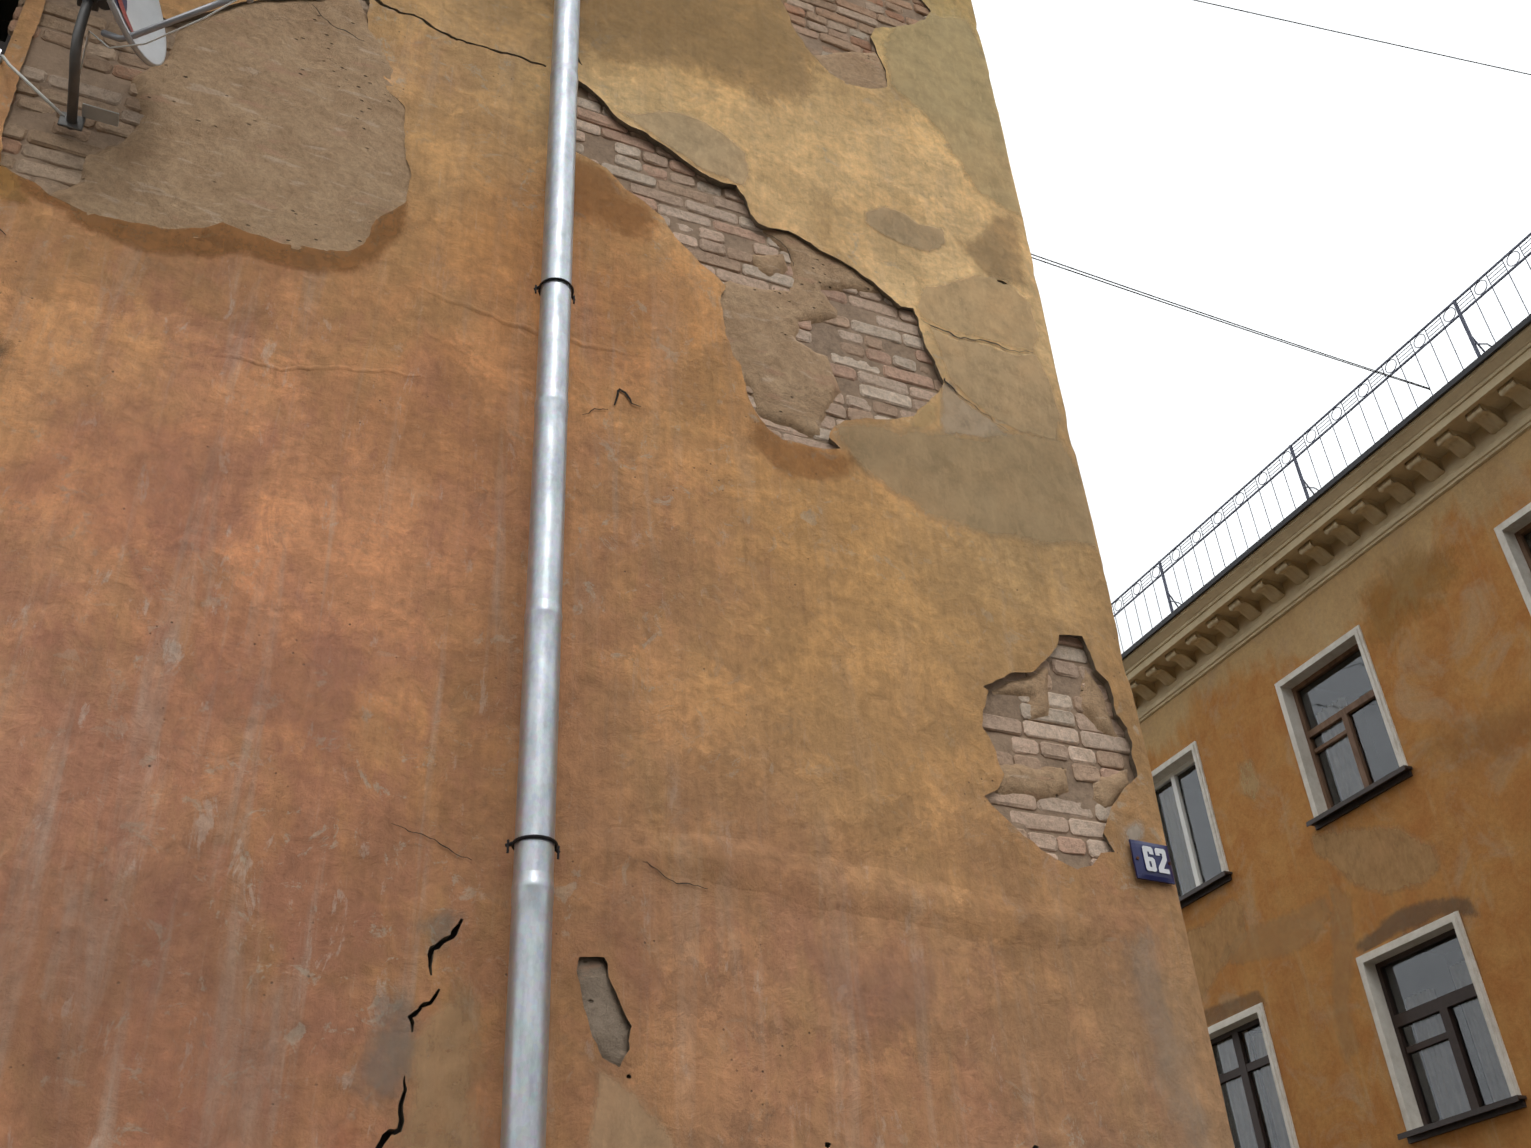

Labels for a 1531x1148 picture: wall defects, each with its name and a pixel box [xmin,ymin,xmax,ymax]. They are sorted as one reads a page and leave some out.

crack [375,0,582,67]
spalling [781,0,931,89]
spalling [0,0,411,251]
spalling [576,80,944,449]
spalling [982,635,1138,869]
crack [407,918,463,1032]
spalling [577,957,632,1079]
crack [375,1076,407,1148]